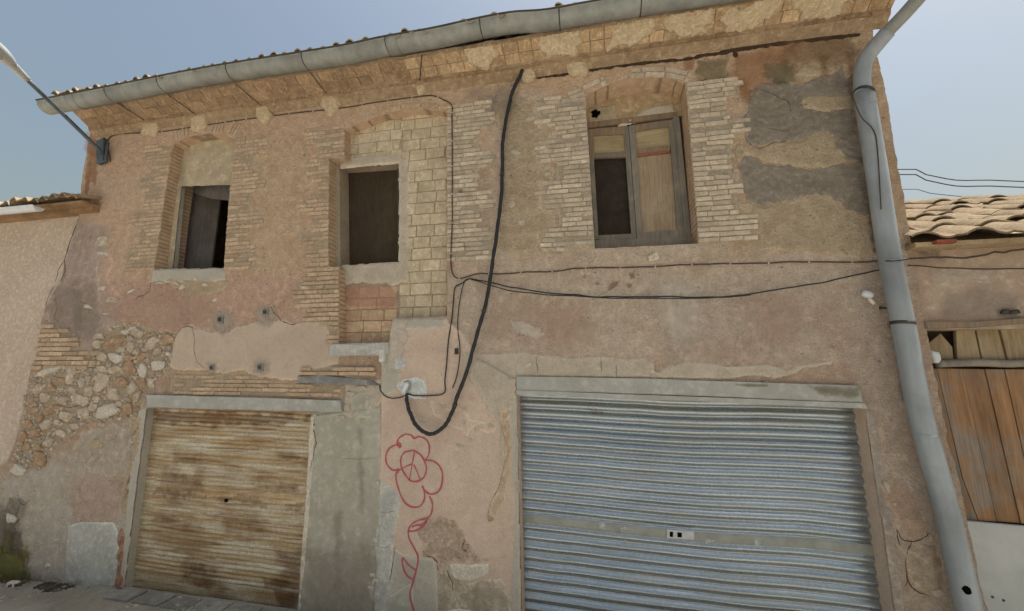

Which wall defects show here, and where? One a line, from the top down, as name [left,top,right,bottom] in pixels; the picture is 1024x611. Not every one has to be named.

peeling [464,45,499,71]
peeling [537,30,582,59]
spalling [802,95,854,112]
spalling [736,133,847,168]
crack [45,221,78,321]
peeling [367,480,512,611]
crack [897,531,929,596]